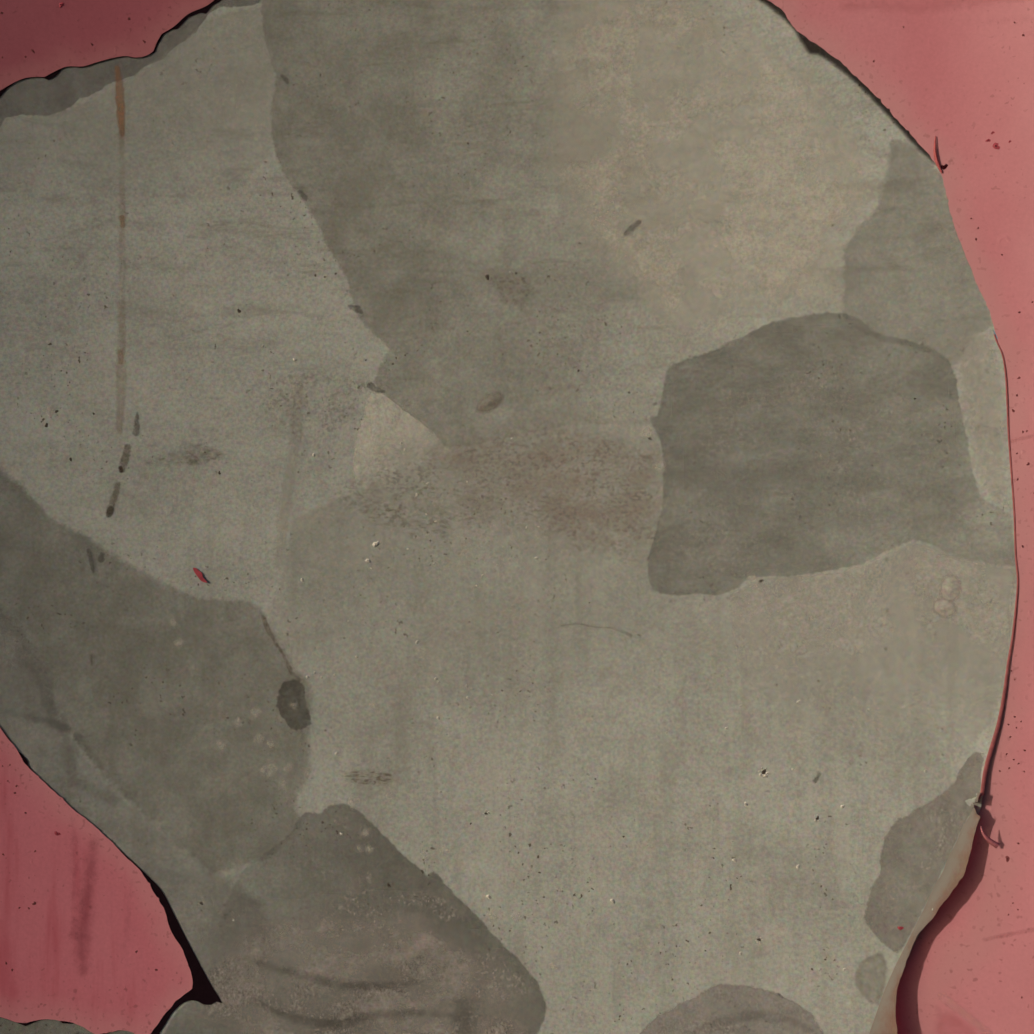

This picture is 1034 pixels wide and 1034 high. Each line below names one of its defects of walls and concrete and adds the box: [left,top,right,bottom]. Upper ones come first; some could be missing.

peeling [0,0,214,91]
corrosion [115,66,124,135]
leakage [749,323,799,347]
leakage [277,680,310,730]
peeling [0,728,193,1034]
leakage [207,818,545,1034]
leakage [865,753,983,951]
leakage [640,984,823,1034]